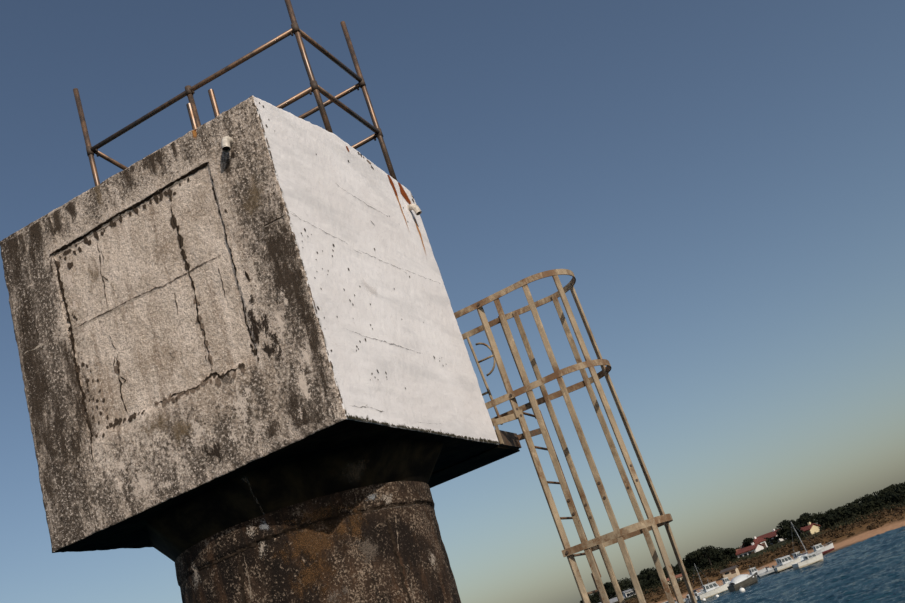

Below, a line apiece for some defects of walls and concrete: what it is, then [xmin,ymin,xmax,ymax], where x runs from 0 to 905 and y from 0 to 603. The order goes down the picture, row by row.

leakage [123,142,179,191]
leakage [5,201,75,286]
rust [388,175,425,250]
crack [50,161,259,464]
leakage [18,297,96,515]
leakage [247,520,269,556]